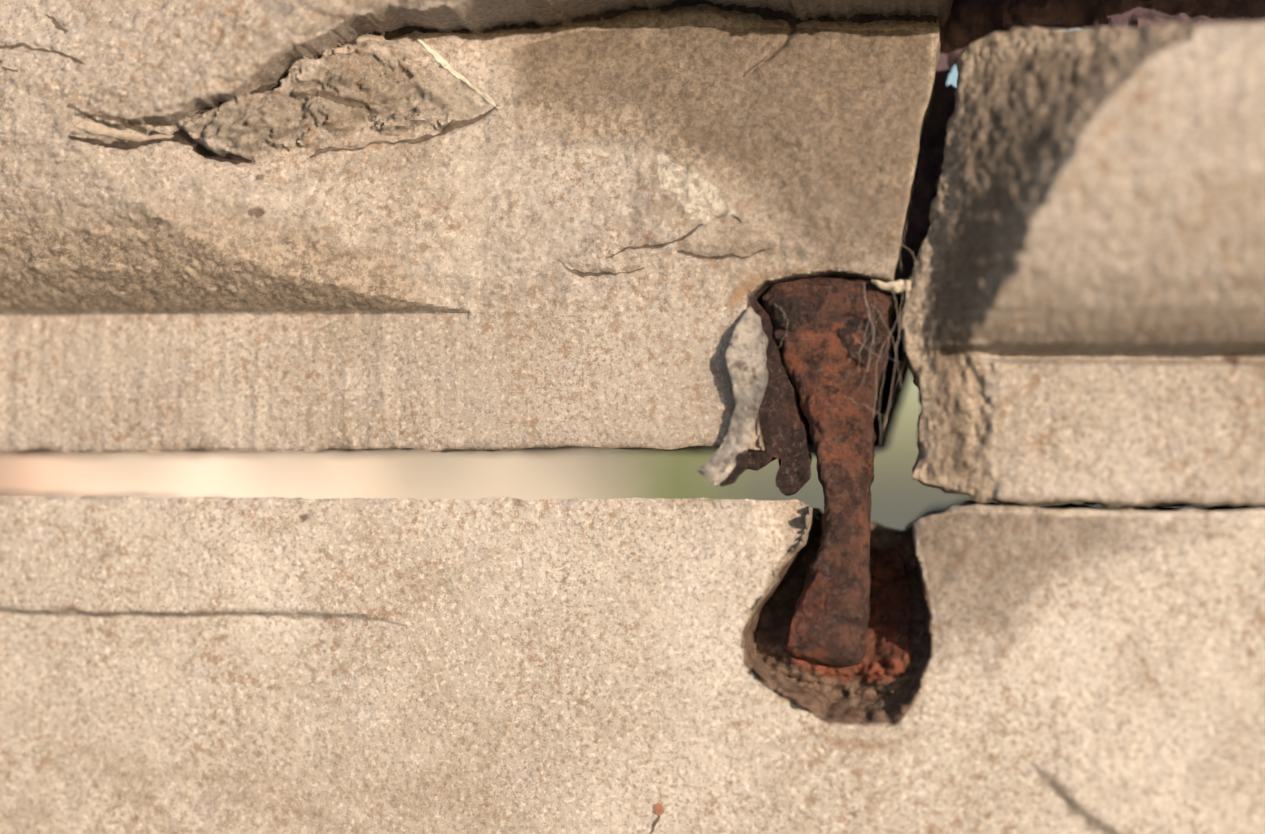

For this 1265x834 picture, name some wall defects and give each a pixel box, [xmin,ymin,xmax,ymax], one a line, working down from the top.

crack [0,14,86,72]
crack [337,0,937,77]
spalling [67,36,664,296]
corrosion [731,270,907,445]
corrosion [743,514,931,724]